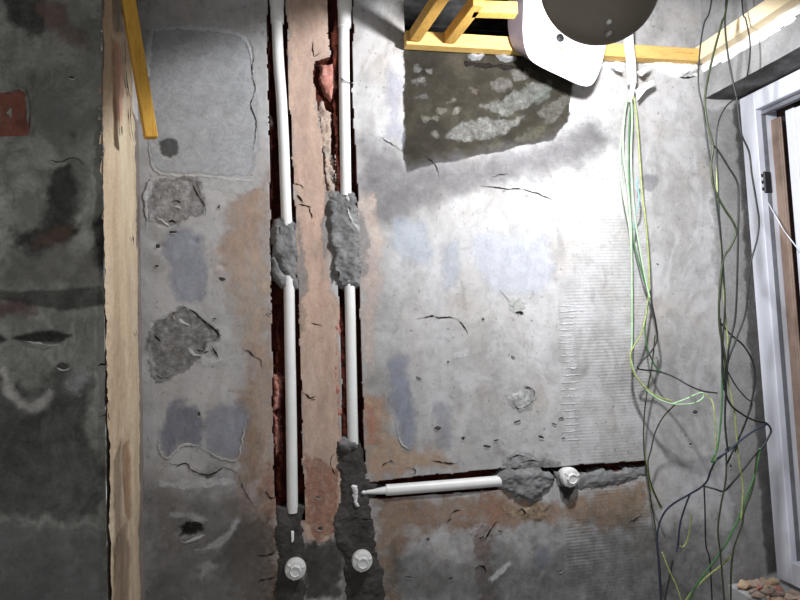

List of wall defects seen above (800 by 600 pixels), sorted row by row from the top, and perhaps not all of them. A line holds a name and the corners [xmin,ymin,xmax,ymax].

peeling [402,49,574,172]
crack [480,173,552,200]
damp [17,165,79,256]
damp [93,216,104,268]
damp [1,288,103,309]
peeling [98,0,221,600]
damp [0,330,70,343]
spalling [506,386,536,412]
crack [168,463,274,503]